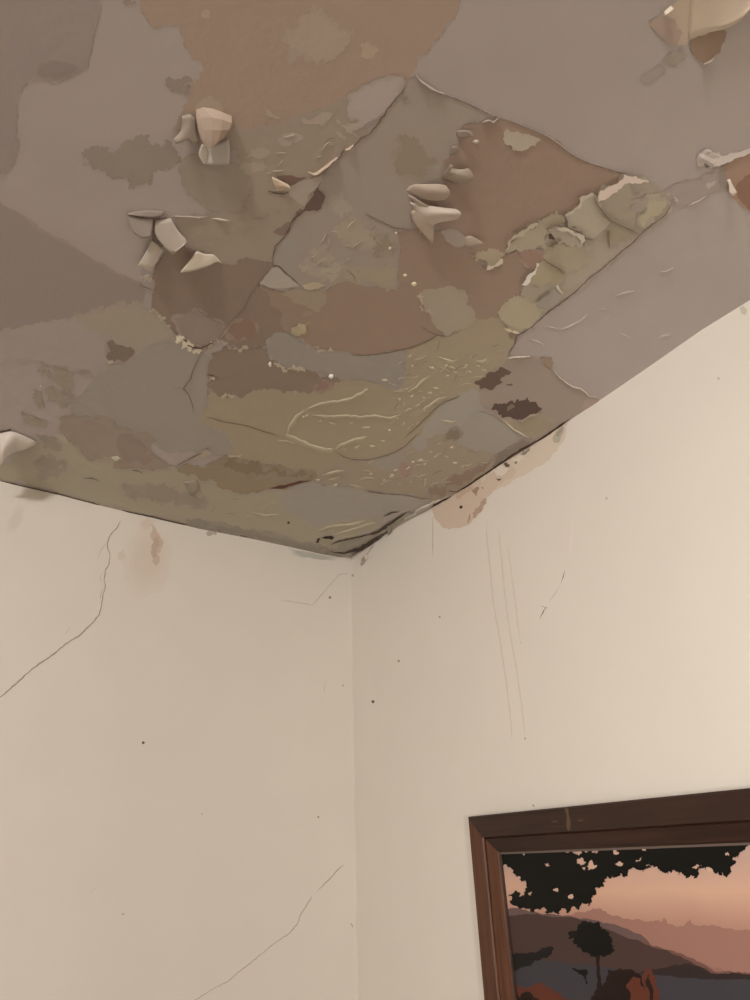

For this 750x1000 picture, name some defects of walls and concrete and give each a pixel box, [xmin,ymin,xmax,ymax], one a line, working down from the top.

peeling [662,0,750,66]
crack [269,83,407,286]
peeling [714,148,750,212]
crack [176,284,275,435]
peeling [70,107,648,494]
crack [353,326,442,356]
peeling [0,431,37,465]
water stain [426,438,533,499]
peeling [431,356,599,529]
crack [0,522,120,697]
crack [195,865,343,1000]